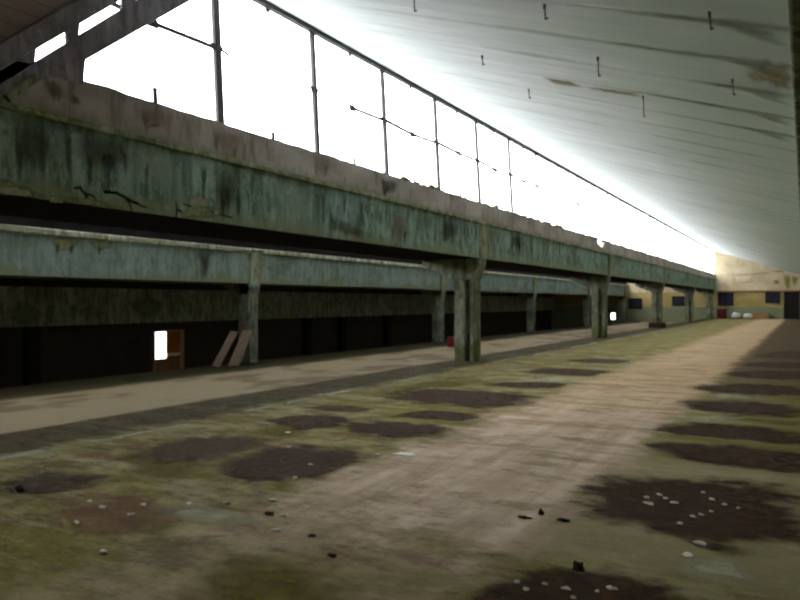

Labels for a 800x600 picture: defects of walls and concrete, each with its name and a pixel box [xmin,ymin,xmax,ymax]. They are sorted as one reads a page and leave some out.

crack [74,186,148,211]
water stain [382,180,395,195]